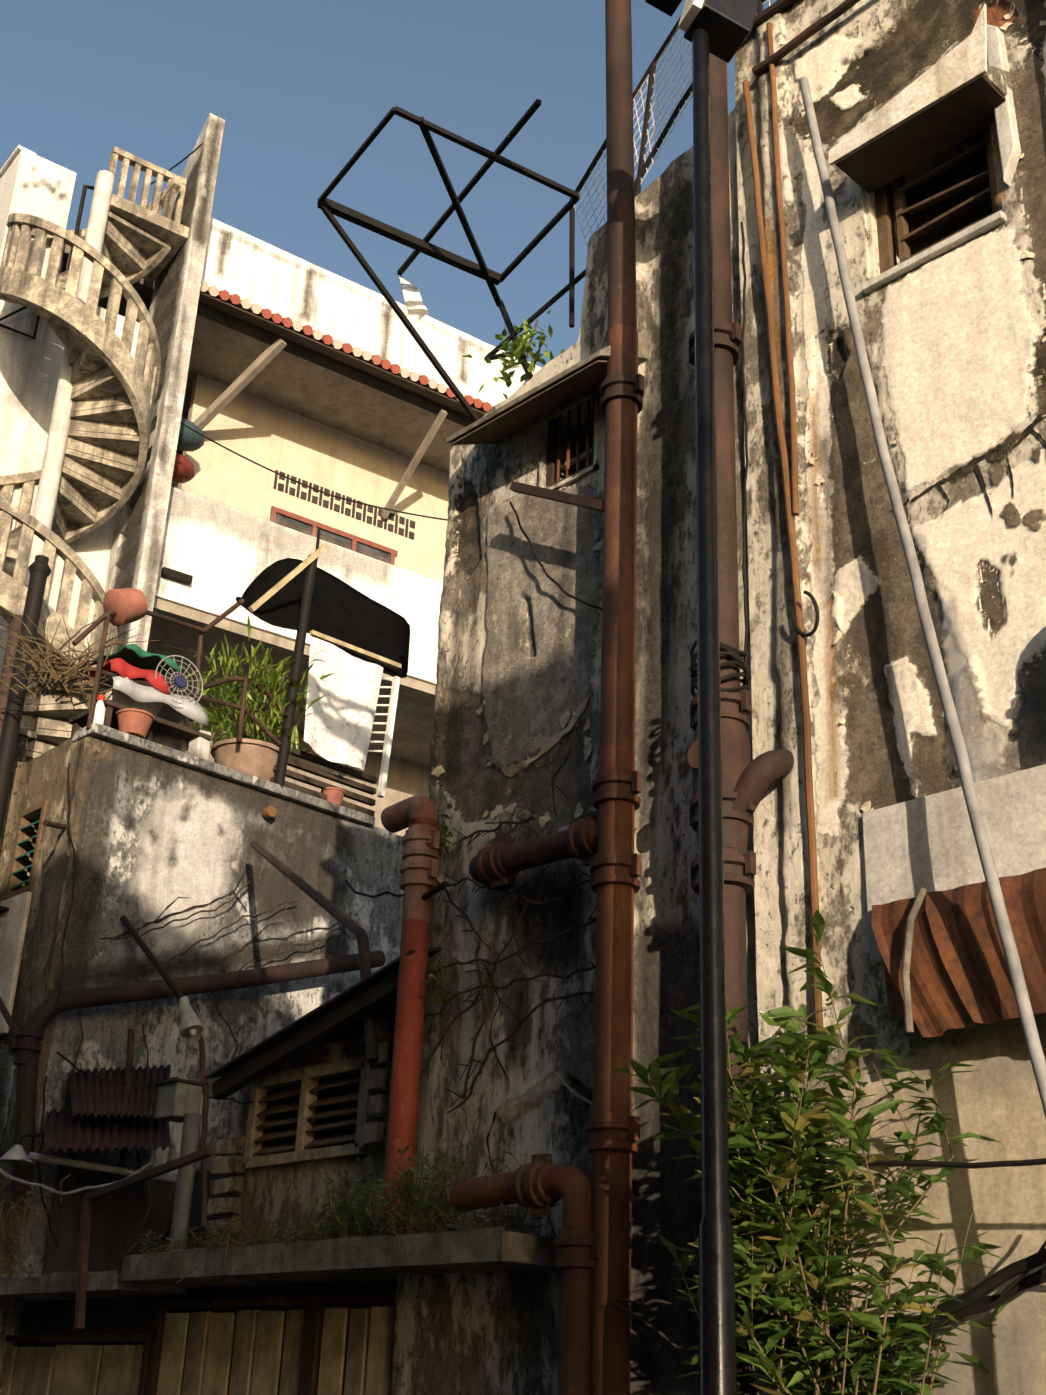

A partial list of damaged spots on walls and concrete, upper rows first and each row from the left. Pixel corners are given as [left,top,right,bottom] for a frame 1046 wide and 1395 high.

damp [218,233,230,273]
damp [300,272,311,318]
damp [381,307,391,360]
peeling [780,0,1046,837]
crack [890,413,1046,518]
flaking render [451,474,483,581]
flaking render [431,686,594,828]
damp [60,738,353,992]